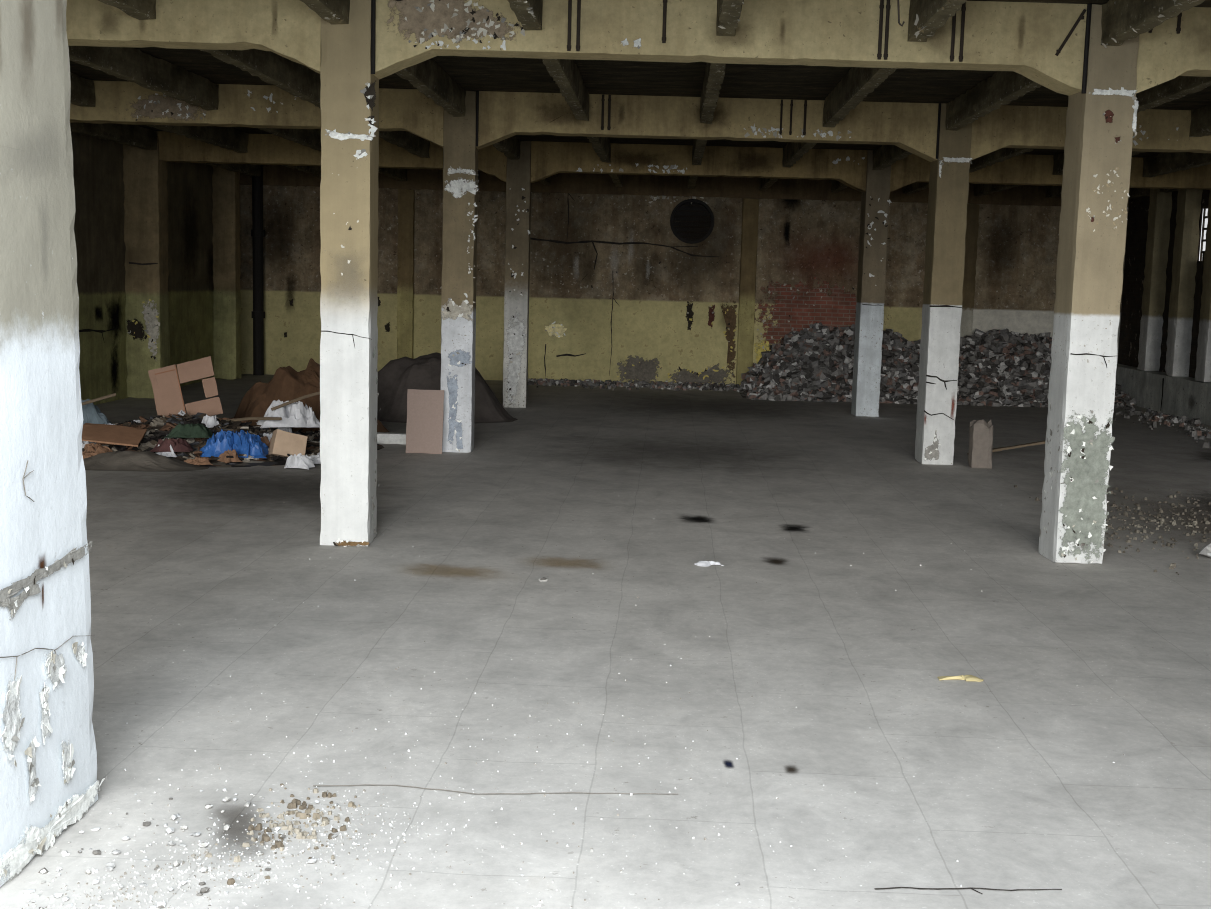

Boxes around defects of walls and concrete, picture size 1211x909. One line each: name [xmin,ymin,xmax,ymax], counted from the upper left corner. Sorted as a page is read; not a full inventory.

peeling [387,0,541,50]
peeling [326,80,378,160]
peeling [445,166,478,278]
flaking render [754,276,857,364]
spalling [0,541,92,620]
peeling [0,642,105,881]